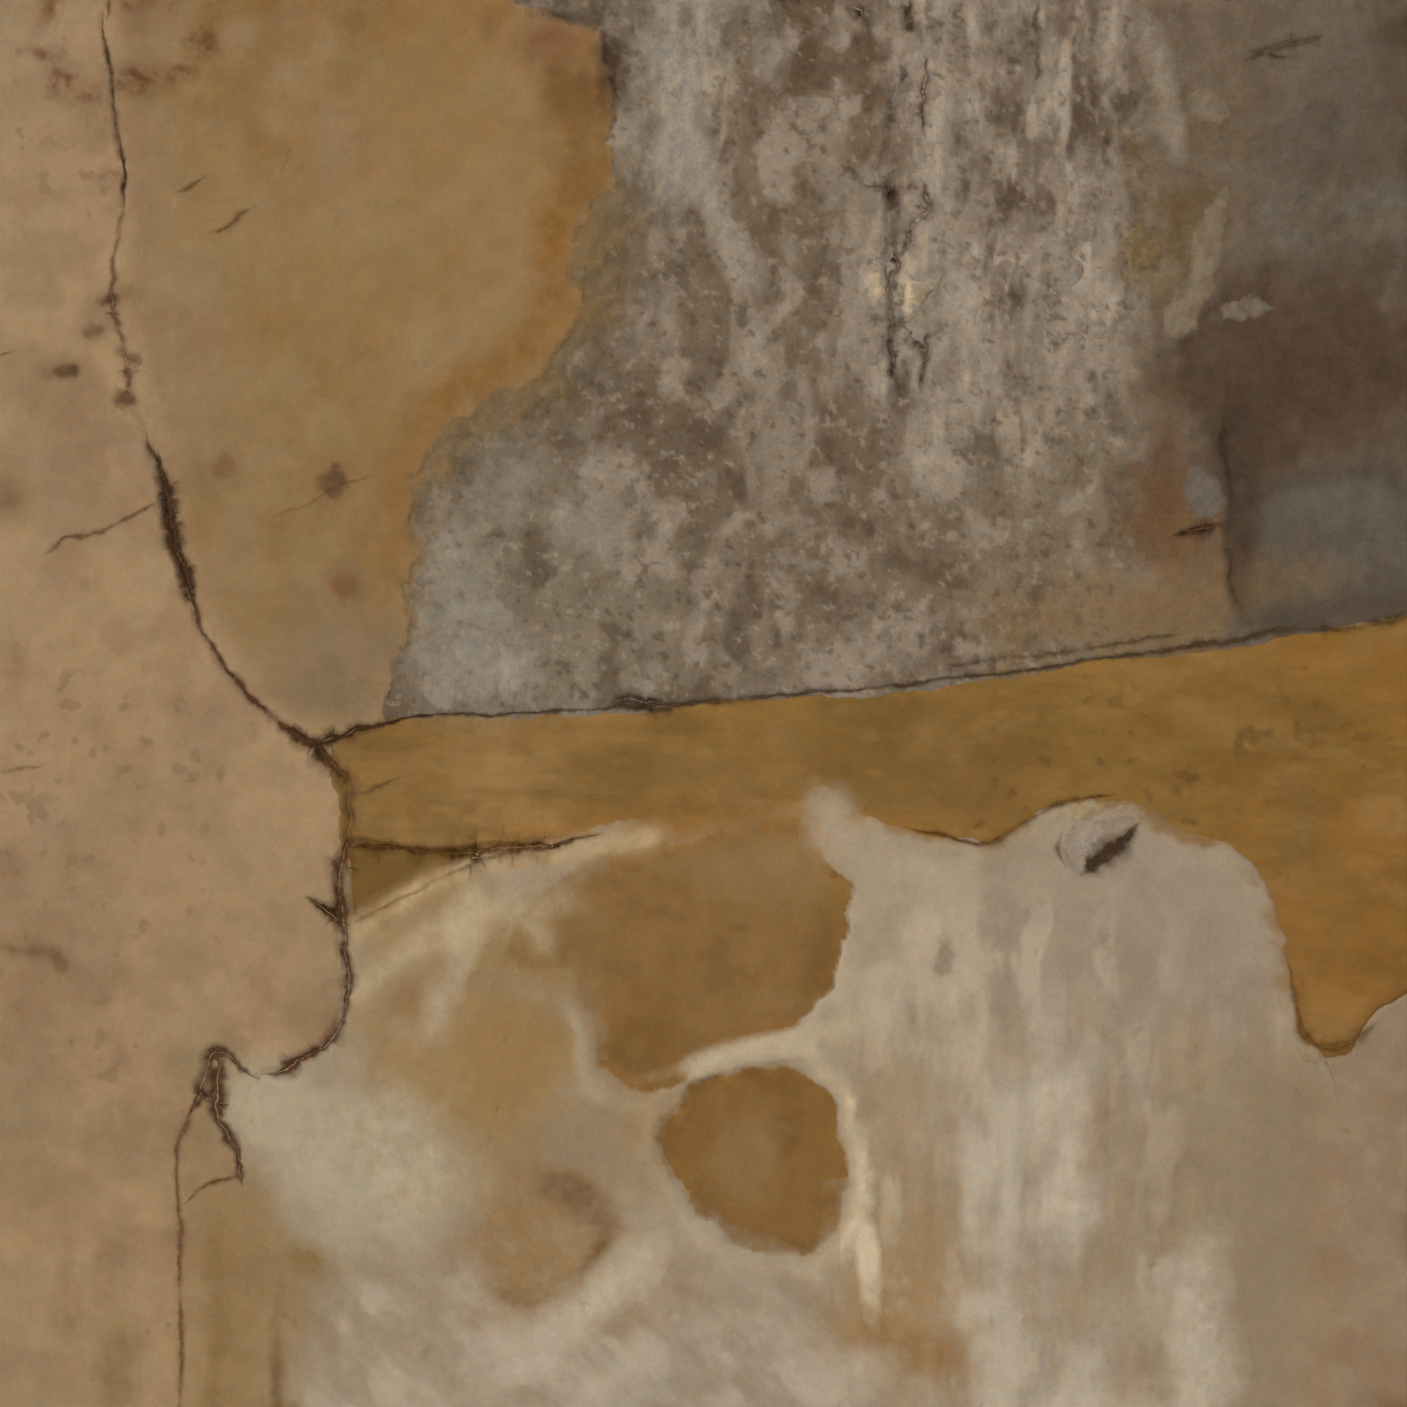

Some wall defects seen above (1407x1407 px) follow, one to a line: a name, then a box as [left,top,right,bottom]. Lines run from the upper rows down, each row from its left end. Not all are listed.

crack [102,2,126,202]
crack [109,259,131,393]
crack [888,235,911,291]
crack [887,338,928,381]
spalling [422,0,1407,718]
spalling [383,679,414,720]
water stain [44,815,761,1407]
crack [58,445,1403,1376]
water stain [627,1008,916,1407]
peeling [306,764,1339,1407]
efflorescence [795,772,866,870]
efflorescence [936,913,1257,1407]